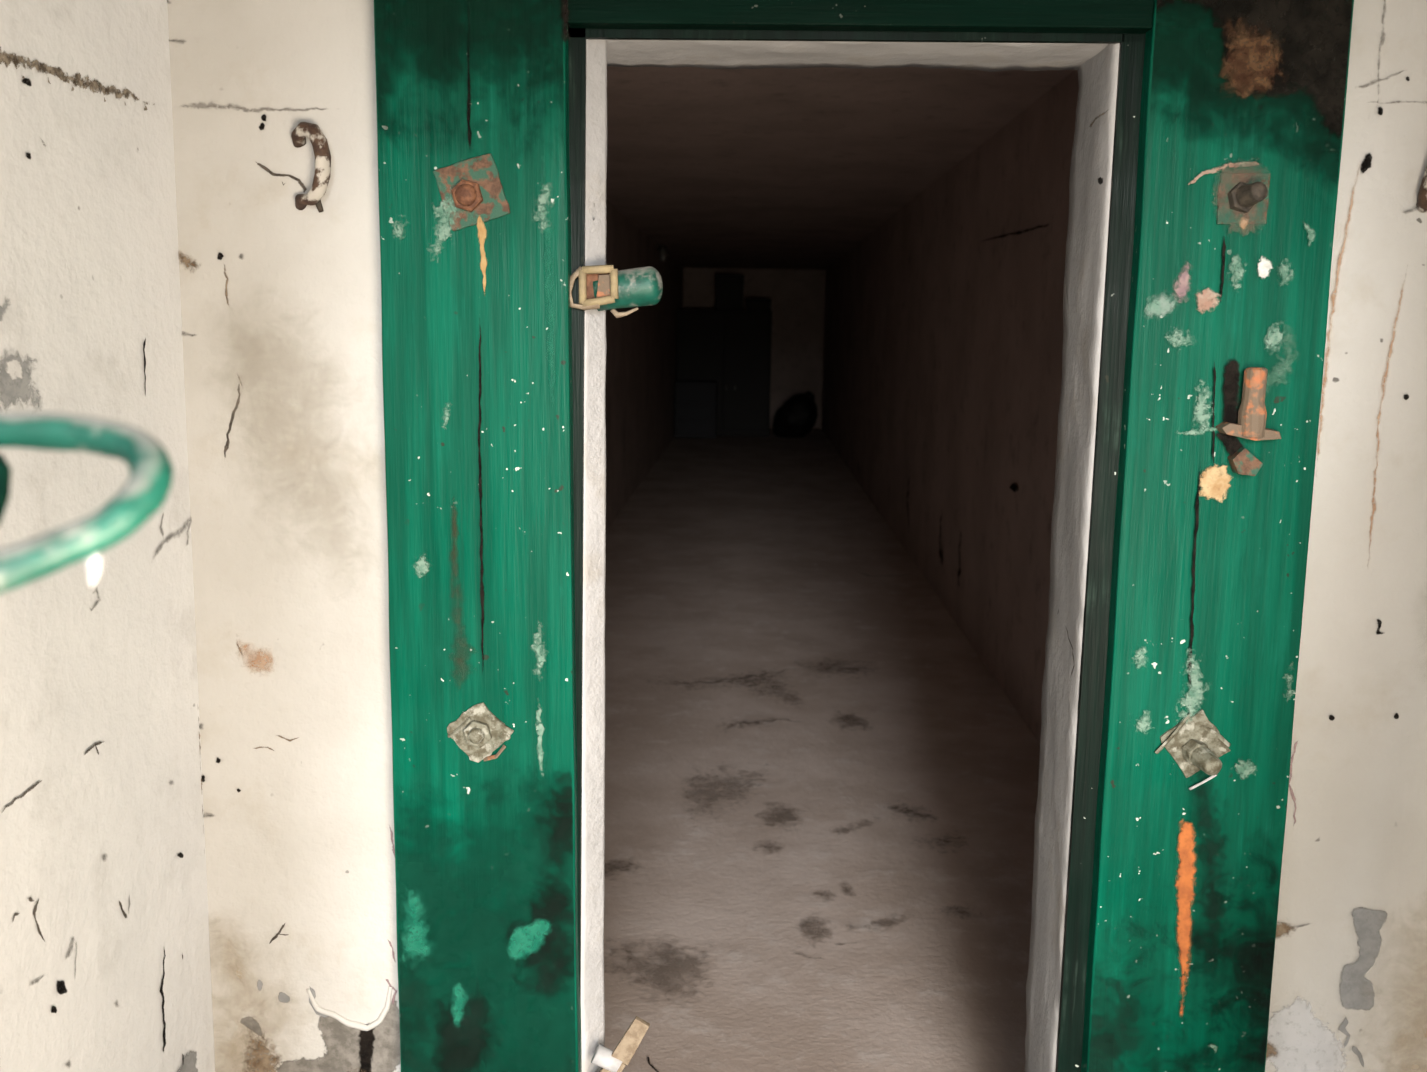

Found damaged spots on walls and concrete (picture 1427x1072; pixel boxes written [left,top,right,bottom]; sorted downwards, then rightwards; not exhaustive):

crack [0,47,148,111]
corrosion [1221,18,1283,98]
crack [1360,0,1427,115]
spalling [240,1017,262,1036]
spalling [277,979,401,1072]
peeling [1266,908,1387,1072]